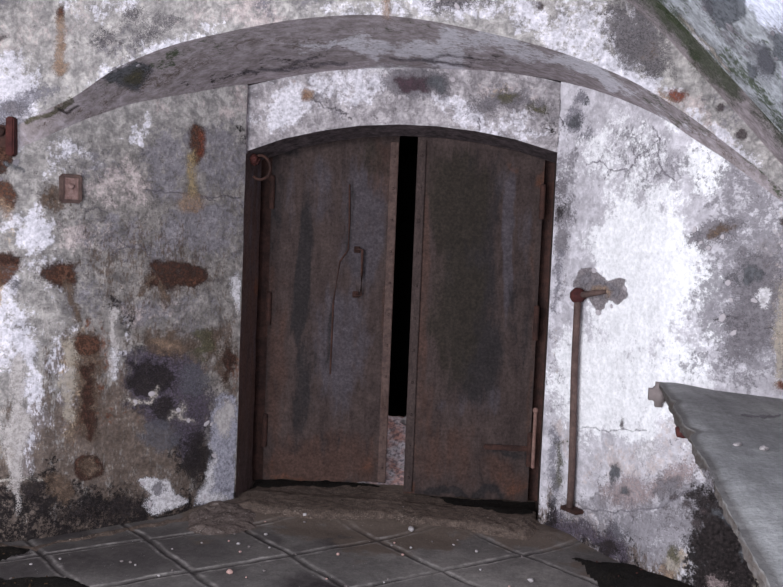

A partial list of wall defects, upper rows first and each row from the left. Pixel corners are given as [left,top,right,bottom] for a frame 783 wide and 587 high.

corrosion [0,180,17,218]
corrosion [179,124,206,213]
corrosion [0,253,20,287]
corrosion [137,259,208,308]
corrosion [40,261,107,442]
water stain [0,353,154,531]
corrosion [73,454,105,481]
water stain [659,483,760,587]